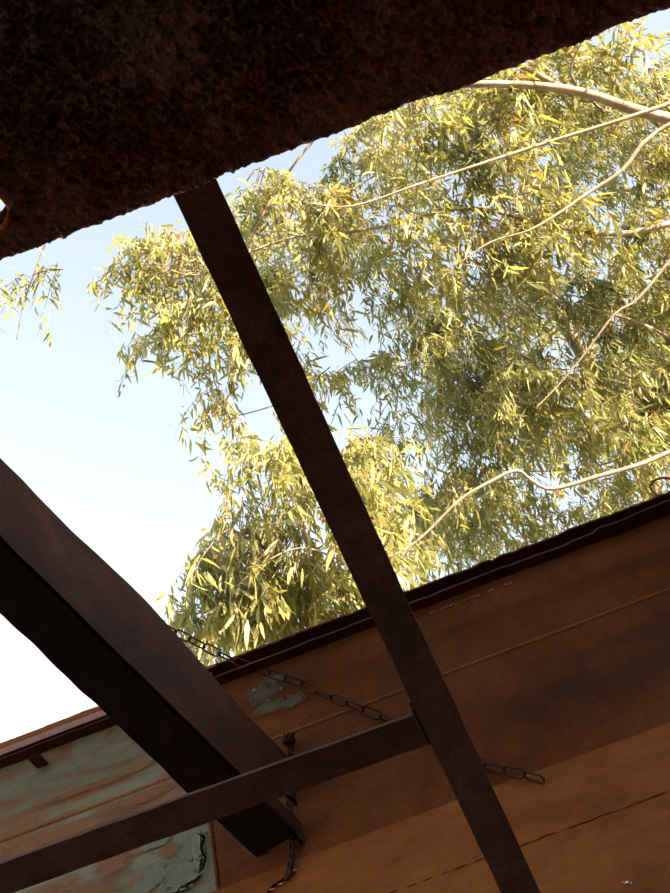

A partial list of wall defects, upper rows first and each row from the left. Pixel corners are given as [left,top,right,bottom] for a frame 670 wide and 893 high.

rust [0,785,171,861]
rust [52,852,133,893]
peeling [137,825,210,893]